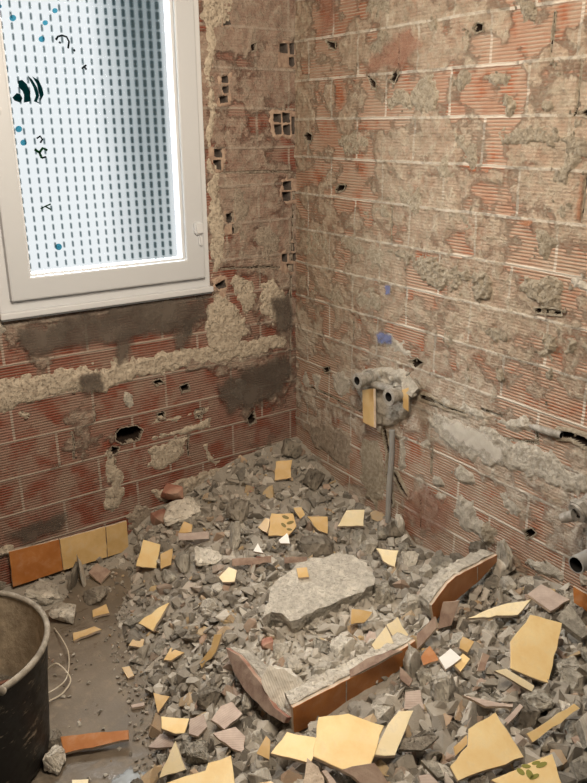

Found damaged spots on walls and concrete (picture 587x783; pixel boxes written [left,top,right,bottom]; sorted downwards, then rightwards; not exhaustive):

spalling [462,21,484,37]
spalling [206,72,232,107]
crack [569,60,583,118]
spalling [269,109,313,144]
spalling [208,145,226,173]
crack [579,171,587,222]
damp [19,295,209,363]
damp [272,295,292,332]
crack [418,392,503,418]
spalling [107,423,148,463]
crack [508,426,587,460]
spalling [522,527,537,540]